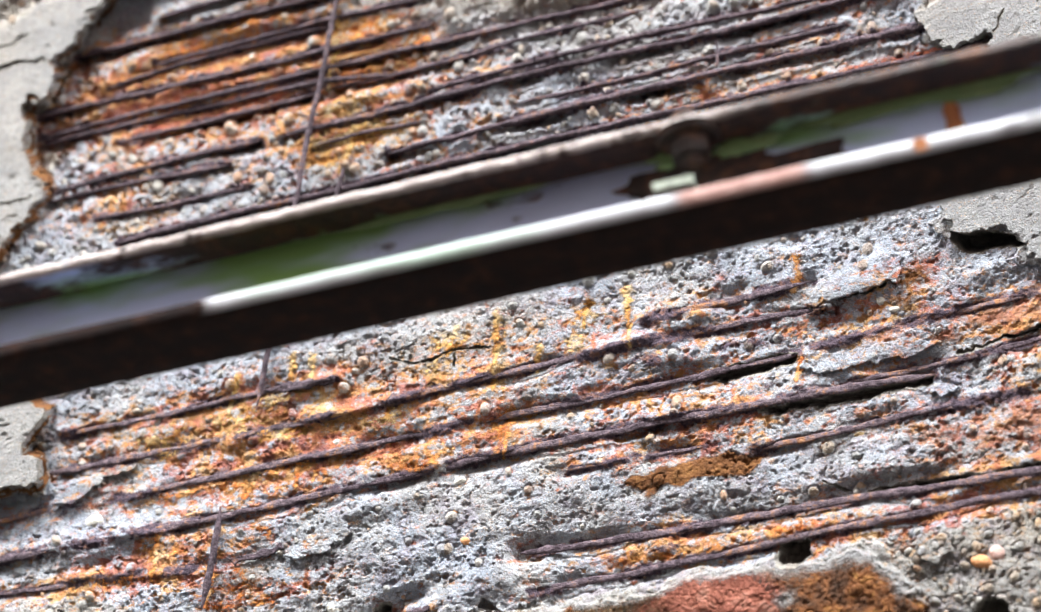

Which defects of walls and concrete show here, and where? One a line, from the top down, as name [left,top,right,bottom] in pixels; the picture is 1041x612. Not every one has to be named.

crack [0,32,47,71]
rust [85,0,308,142]
rust [297,1,446,174]
spalling [0,0,1041,275]
rust [611,137,849,202]
rust [204,372,403,444]
spalling [0,204,1041,612]
rust [148,460,333,504]
rust [623,448,762,499]
rust [605,518,827,567]
rust [195,566,284,612]
rust [564,558,930,612]